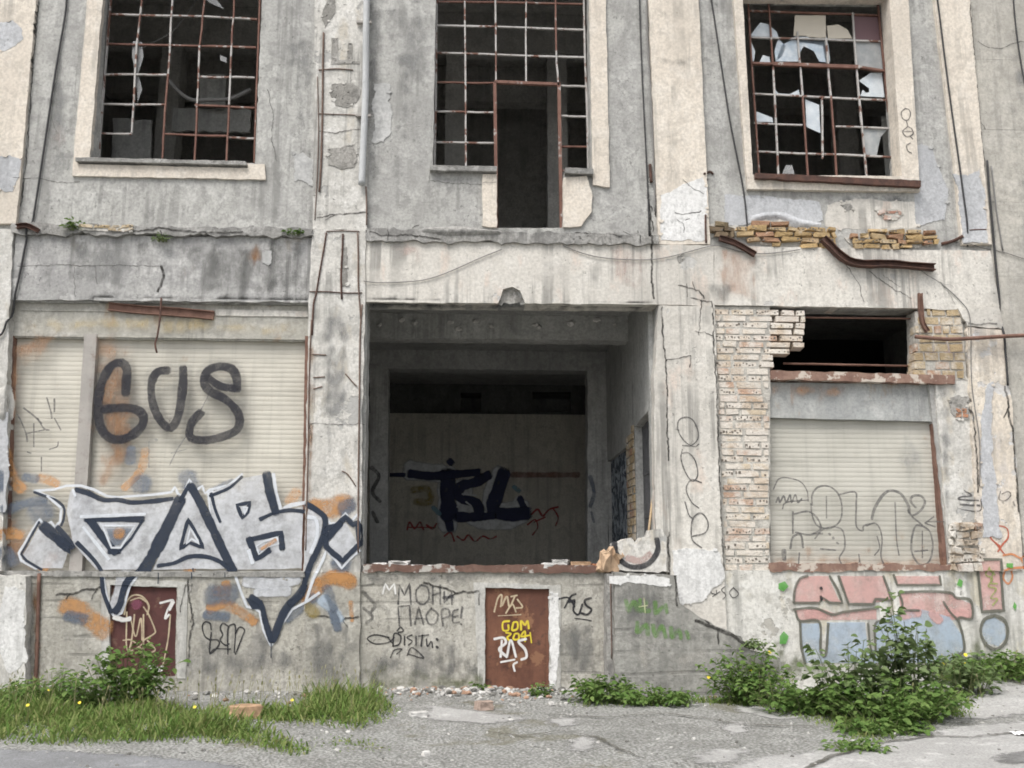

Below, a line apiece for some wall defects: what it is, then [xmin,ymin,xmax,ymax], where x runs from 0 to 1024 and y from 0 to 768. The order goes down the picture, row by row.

peeling [0,155,22,192]
spalling [325,143,358,169]
peeling [329,81,393,144]
peeling [658,144,989,250]
rust [107,302,215,320]
rust [305,186,367,553]
crack [574,181,724,567]
peeling [947,382,1002,573]
rust [33,573,41,683]
peeling [609,548,725,605]